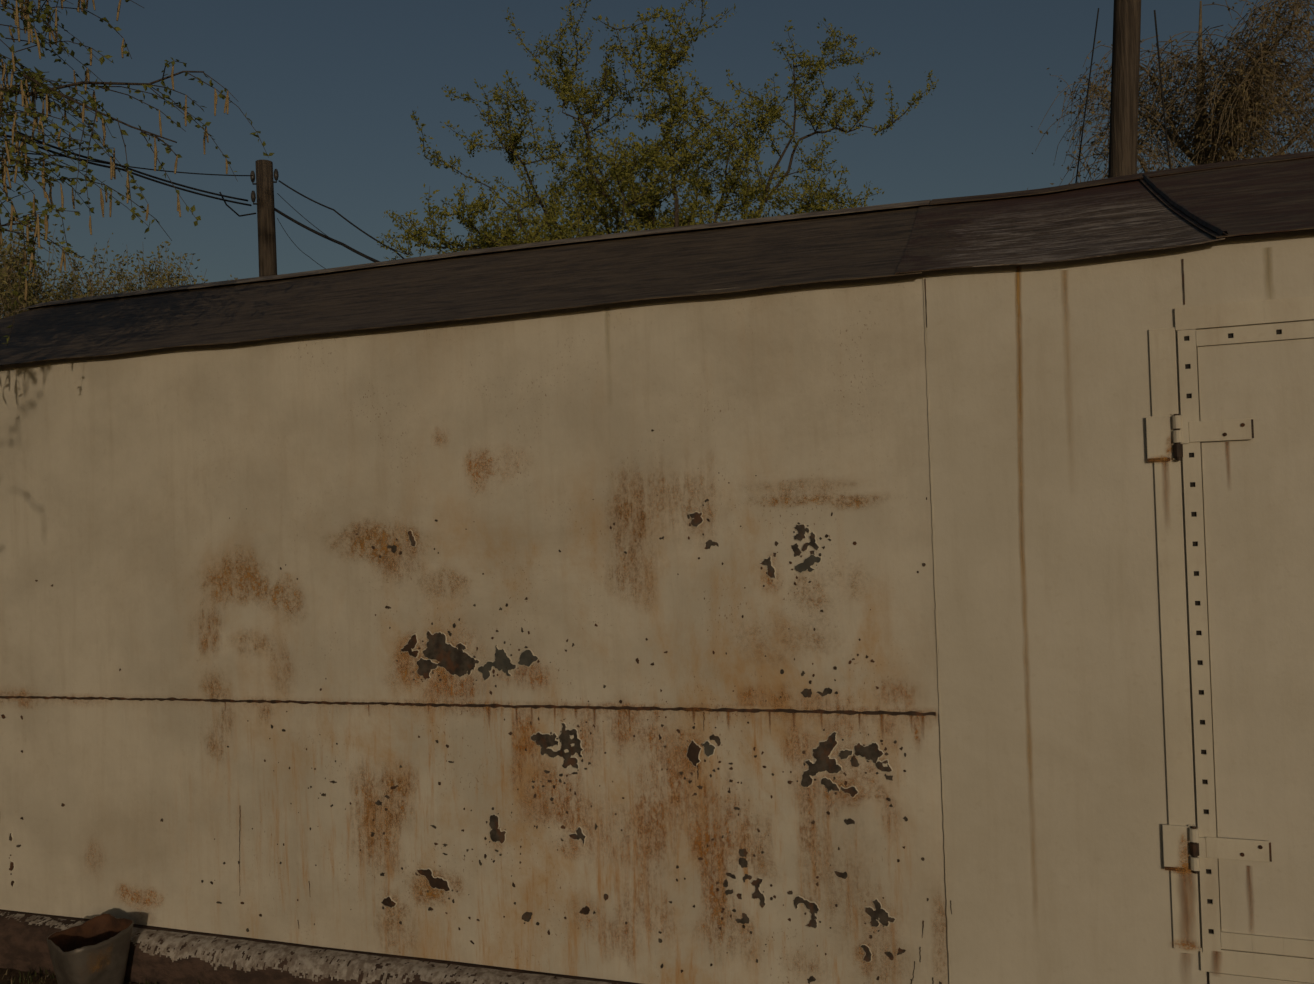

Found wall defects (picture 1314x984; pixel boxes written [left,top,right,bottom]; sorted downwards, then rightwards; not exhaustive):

peeling [760,522,831,586]
peeling [400,618,551,695]
peeling [525,719,591,801]
peeling [659,724,740,810]
peeling [753,729,906,798]
peeling [131,927,611,984]
peeling [381,895,402,924]
peeling [401,825,458,914]
peeling [466,807,507,866]
peeling [512,882,550,935]
peeling [716,848,838,934]
peeling [859,897,906,980]